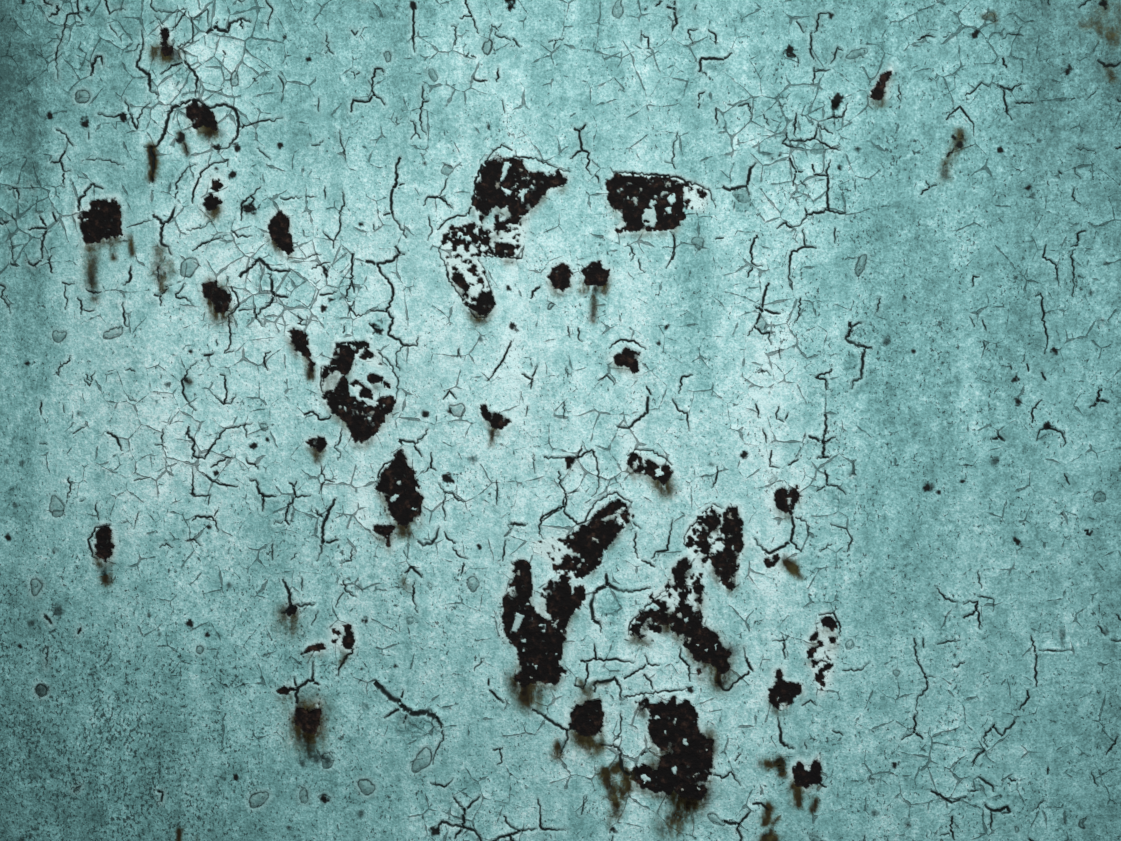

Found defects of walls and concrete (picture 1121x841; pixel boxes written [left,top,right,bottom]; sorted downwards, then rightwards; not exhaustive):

crack [965,33,1034,120]
crack [640,0,848,373]
crack [0,0,756,704]
crack [755,298,881,495]
crack [1010,230,1087,485]
corrosion [276,686,324,748]
crack [373,680,587,841]
crack [496,446,754,776]
crack [711,754,769,841]
crack [754,512,831,555]
crack [901,570,982,740]
crack [930,635,1072,841]